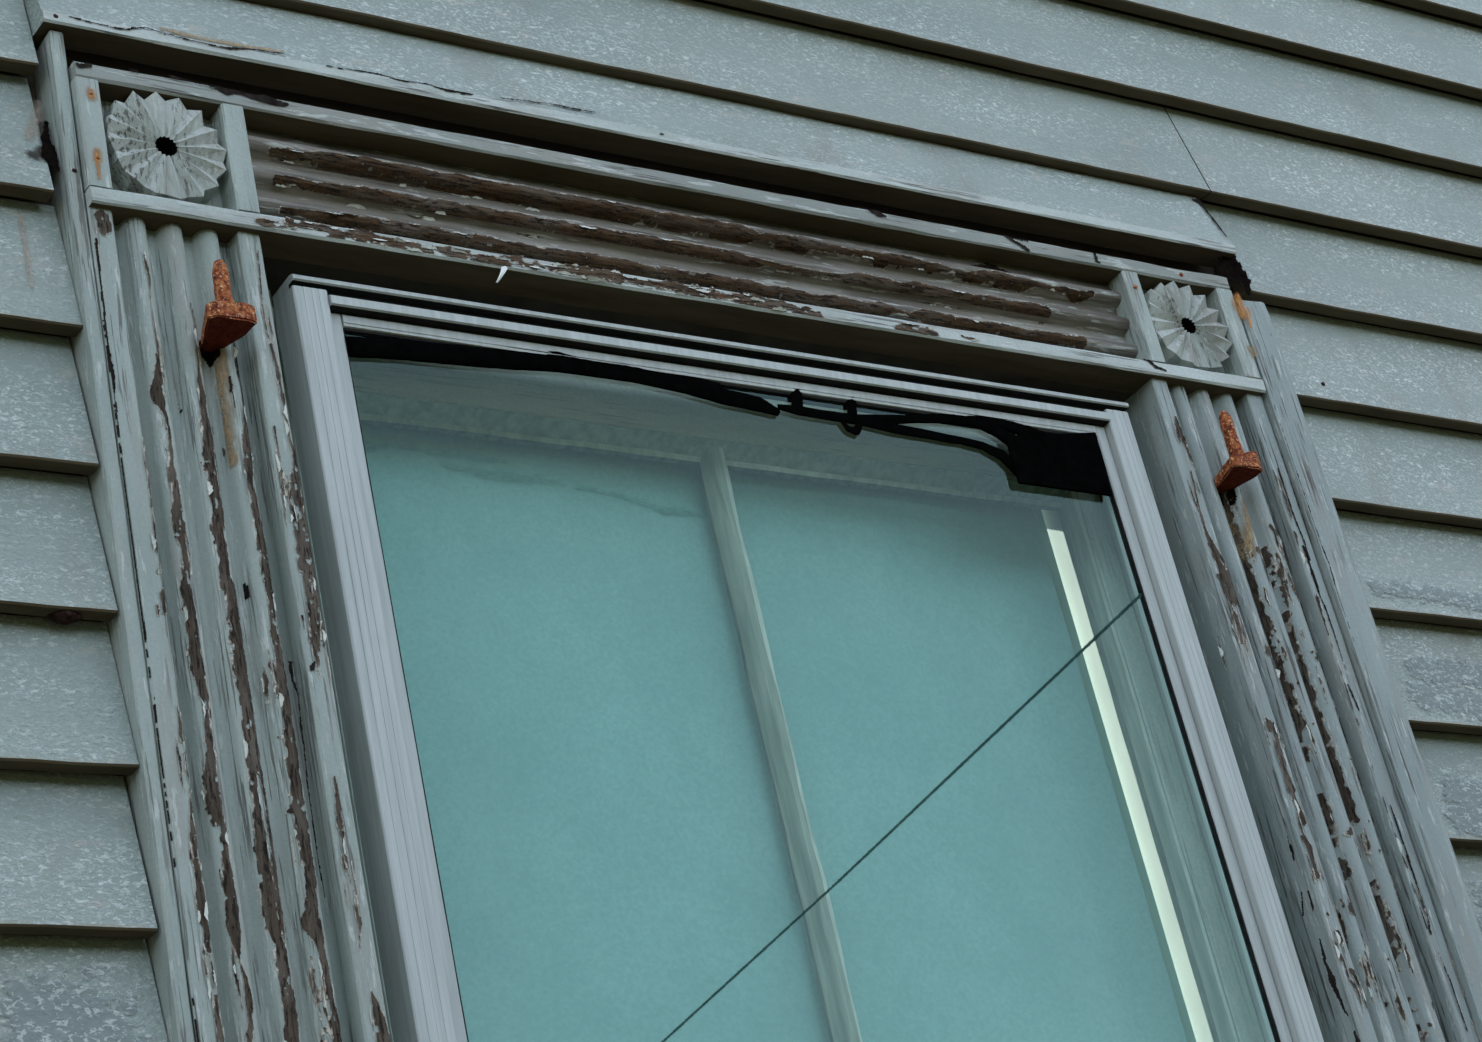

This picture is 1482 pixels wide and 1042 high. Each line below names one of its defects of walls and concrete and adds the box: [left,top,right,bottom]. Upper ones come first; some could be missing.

peeling [255,147,1095,350]
peeling [142,252,254,1042]
peeling [190,251,343,1042]
peeling [333,775,362,950]
peeling [369,990,391,1042]
peeling [1174,415,1445,1042]